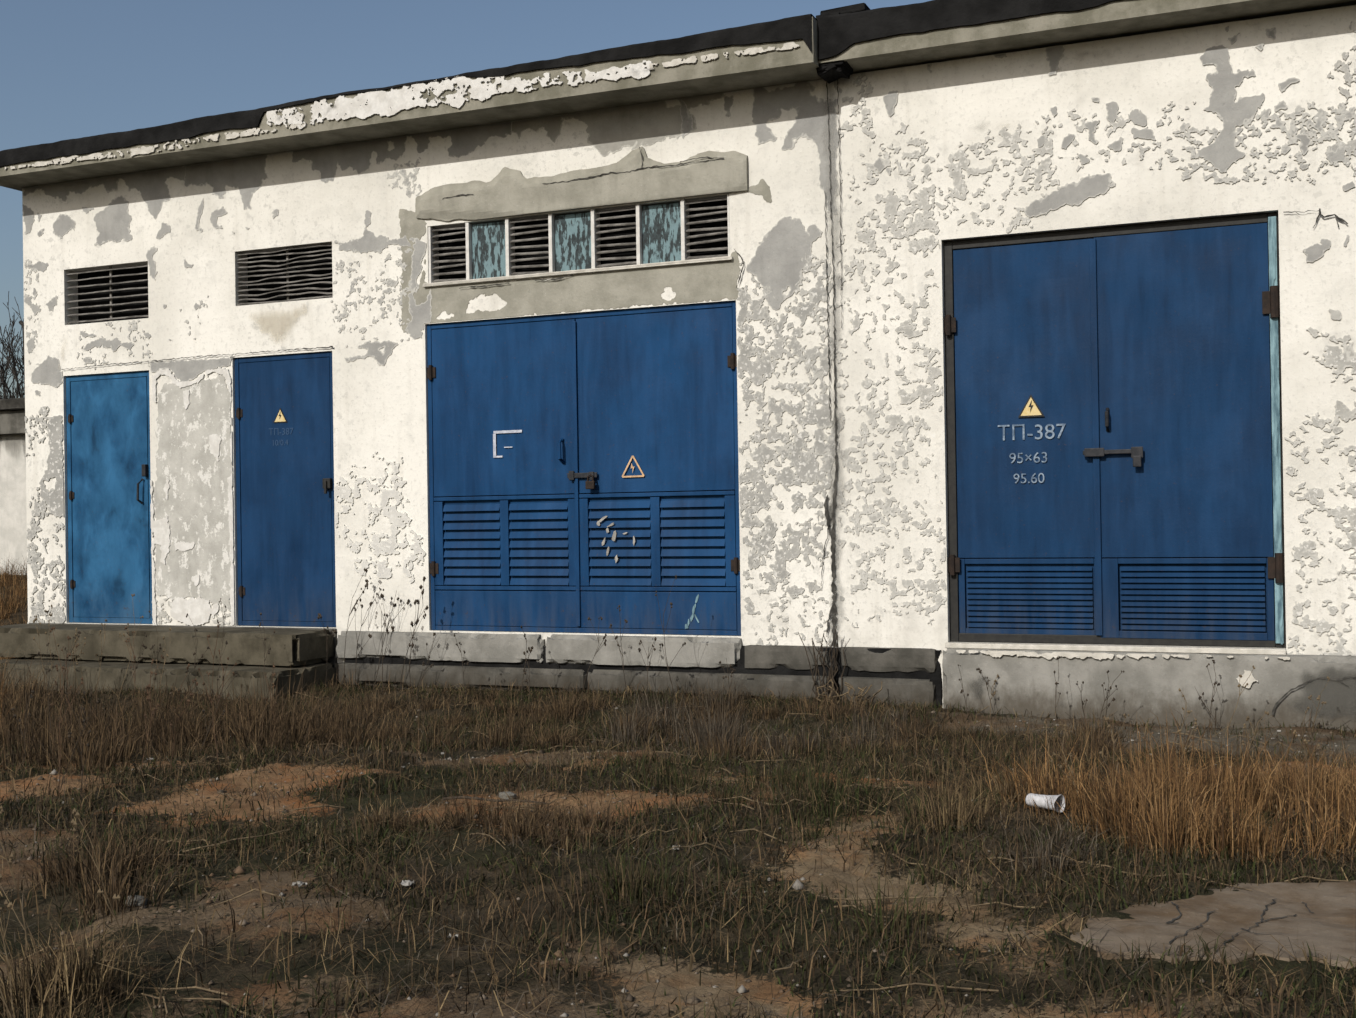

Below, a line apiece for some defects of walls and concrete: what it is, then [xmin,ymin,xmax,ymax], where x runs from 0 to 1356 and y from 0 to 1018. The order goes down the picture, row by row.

peeling [5,42,800,627]
peeling [247,21,1356,660]
crack [821,80,842,646]
spalling [1236,670,1258,688]